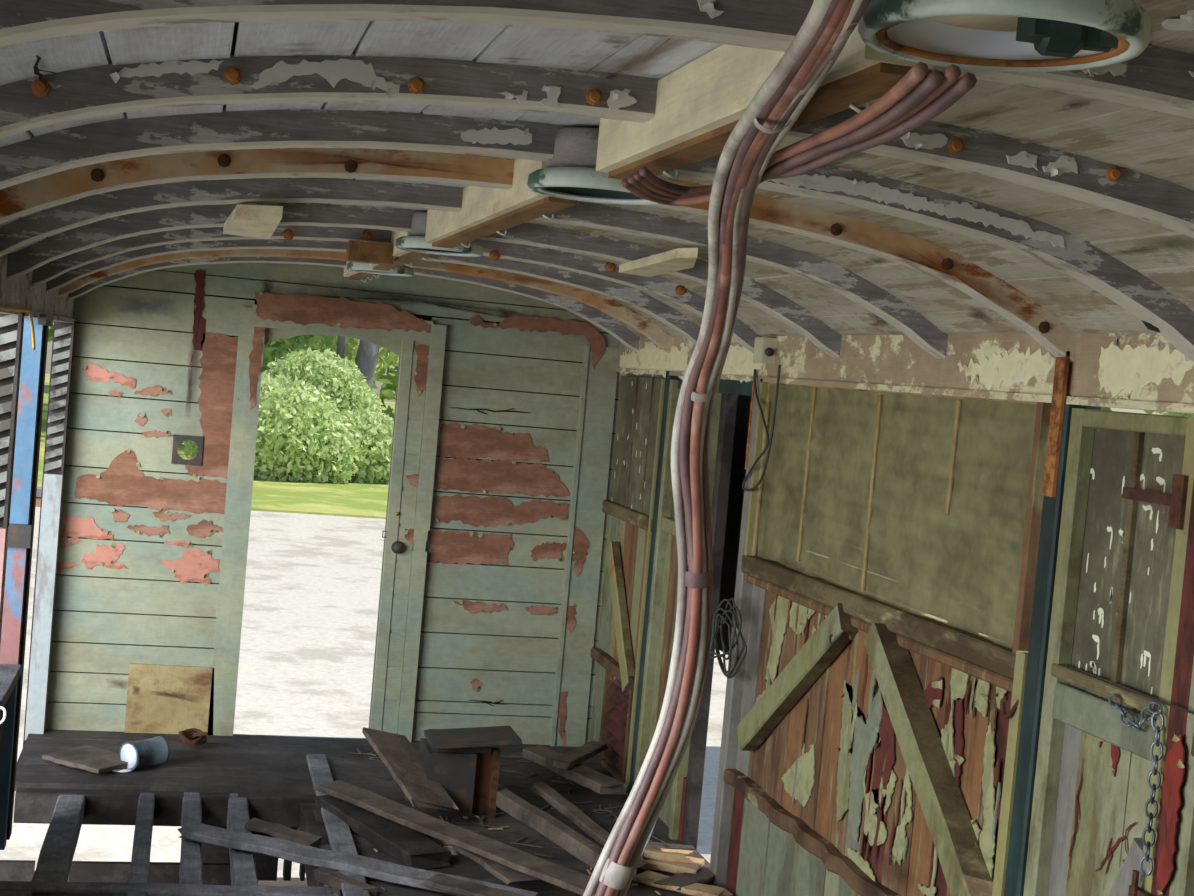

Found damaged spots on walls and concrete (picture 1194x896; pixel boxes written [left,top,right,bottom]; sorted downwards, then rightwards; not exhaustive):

peeling [109,59,224,83]
peeling [250,59,400,99]
peeling [607,89,637,111]
peeling [461,127,532,145]
corrosion [922,261,989,295]
peeling [1098,338,1194,400]
peeling [57,270,432,584]
peeling [429,422,589,576]
peeling [755,594,827,704]
peeling [782,698,815,807]
peeling [836,653,912,882]
peeling [918,848,937,896]